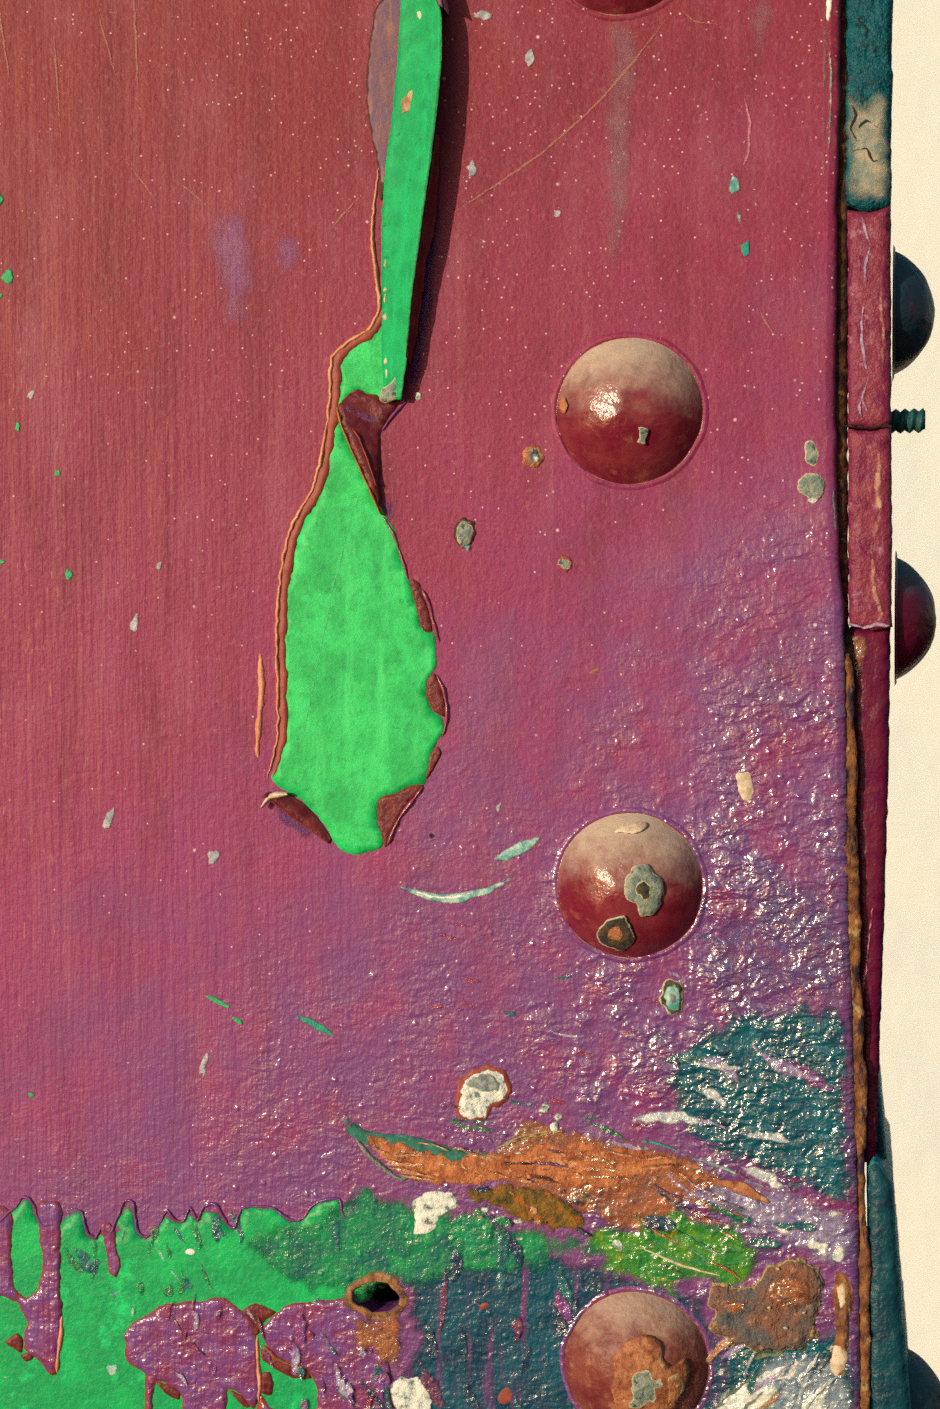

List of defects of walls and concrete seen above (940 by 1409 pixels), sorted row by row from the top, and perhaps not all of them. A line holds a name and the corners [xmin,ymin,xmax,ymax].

peeling [255,0,449,855]
peeling [454,1064,512,1123]
peeling [0,1195,432,1409]
peeling [412,1191,457,1234]
corrosion [344,1114,824,1355]